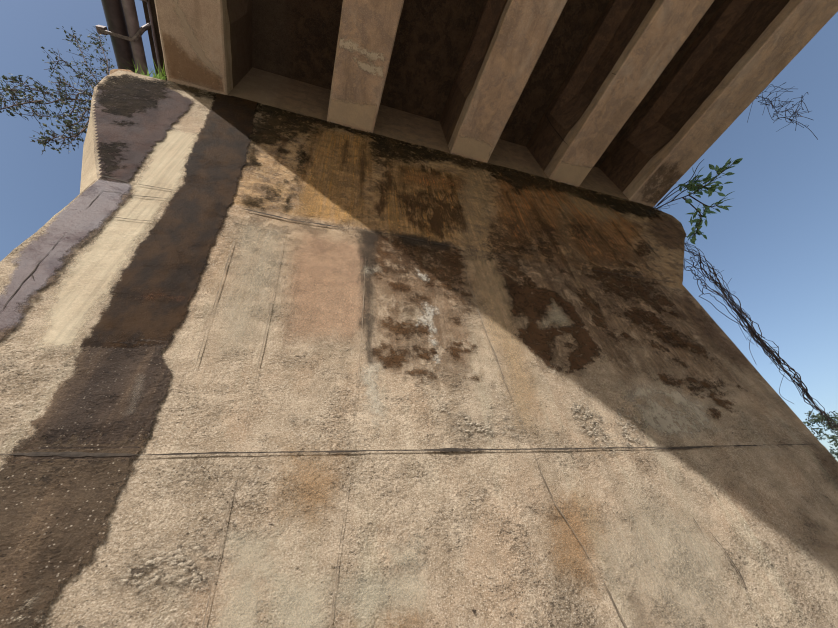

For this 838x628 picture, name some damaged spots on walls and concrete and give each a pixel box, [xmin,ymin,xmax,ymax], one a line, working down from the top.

crack [88,174,177,207]
damp [0,74,682,628]
damp [683,300,746,364]
crack [0,207,761,628]
damp [632,388,709,434]